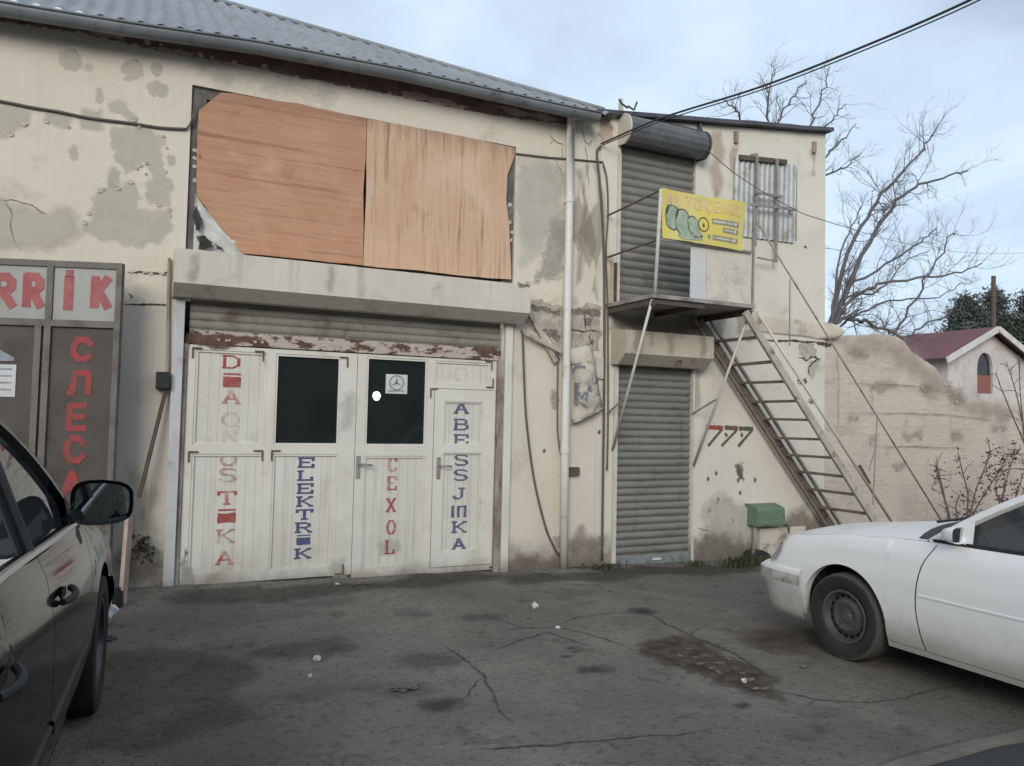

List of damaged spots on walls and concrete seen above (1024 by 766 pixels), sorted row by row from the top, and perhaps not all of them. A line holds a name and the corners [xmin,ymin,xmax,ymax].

peeling [0,17,567,124]
peeling [0,90,174,247]
crack [4,199,46,249]
corrosion [184,333,264,349]
corrosion [472,345,501,355]
flaking render [526,299,603,351]
flaking render [797,343,819,385]